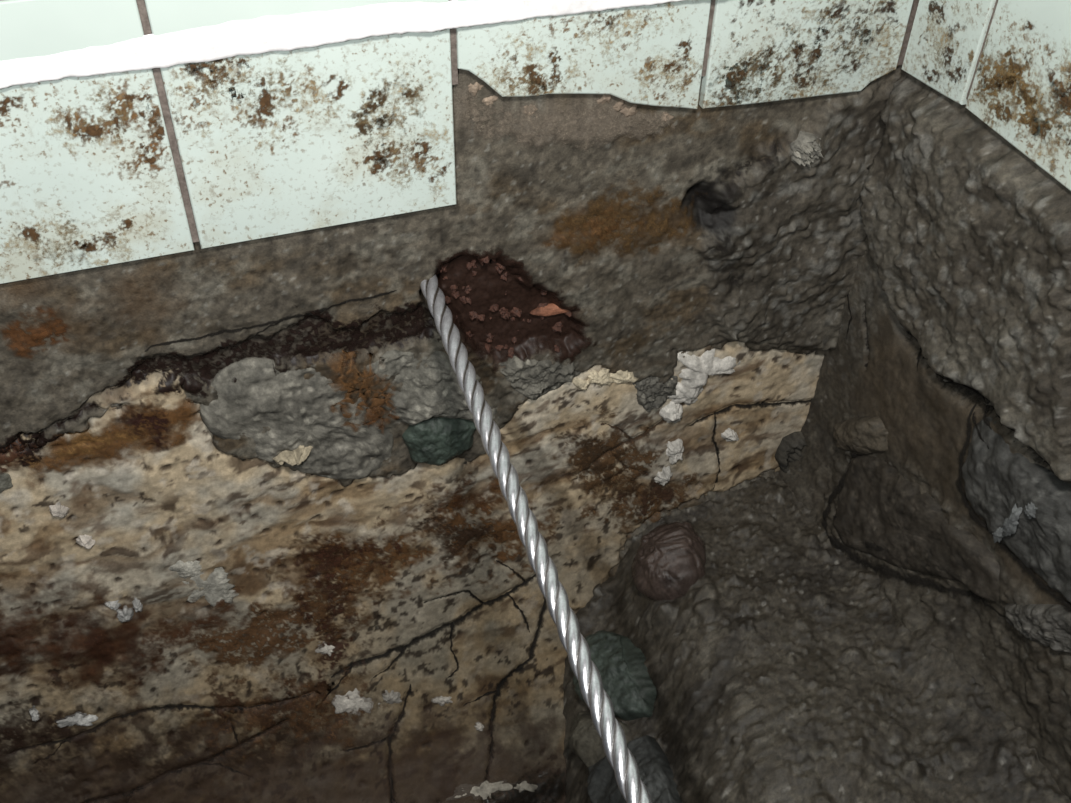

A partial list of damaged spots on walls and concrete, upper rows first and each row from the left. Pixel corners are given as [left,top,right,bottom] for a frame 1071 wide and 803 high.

corrosion [49,84,169,171]
corrosion [177,58,348,151]
corrosion [352,82,451,189]
spalling [427,249,597,371]
crack [0,290,442,467]
efflorescence [659,348,741,423]
spalling [500,341,824,614]
efflorescence [654,439,684,486]
crack [901,325,1071,611]
spalling [0,366,567,803]
crack [7,560,547,803]
water stain [0,688,566,803]